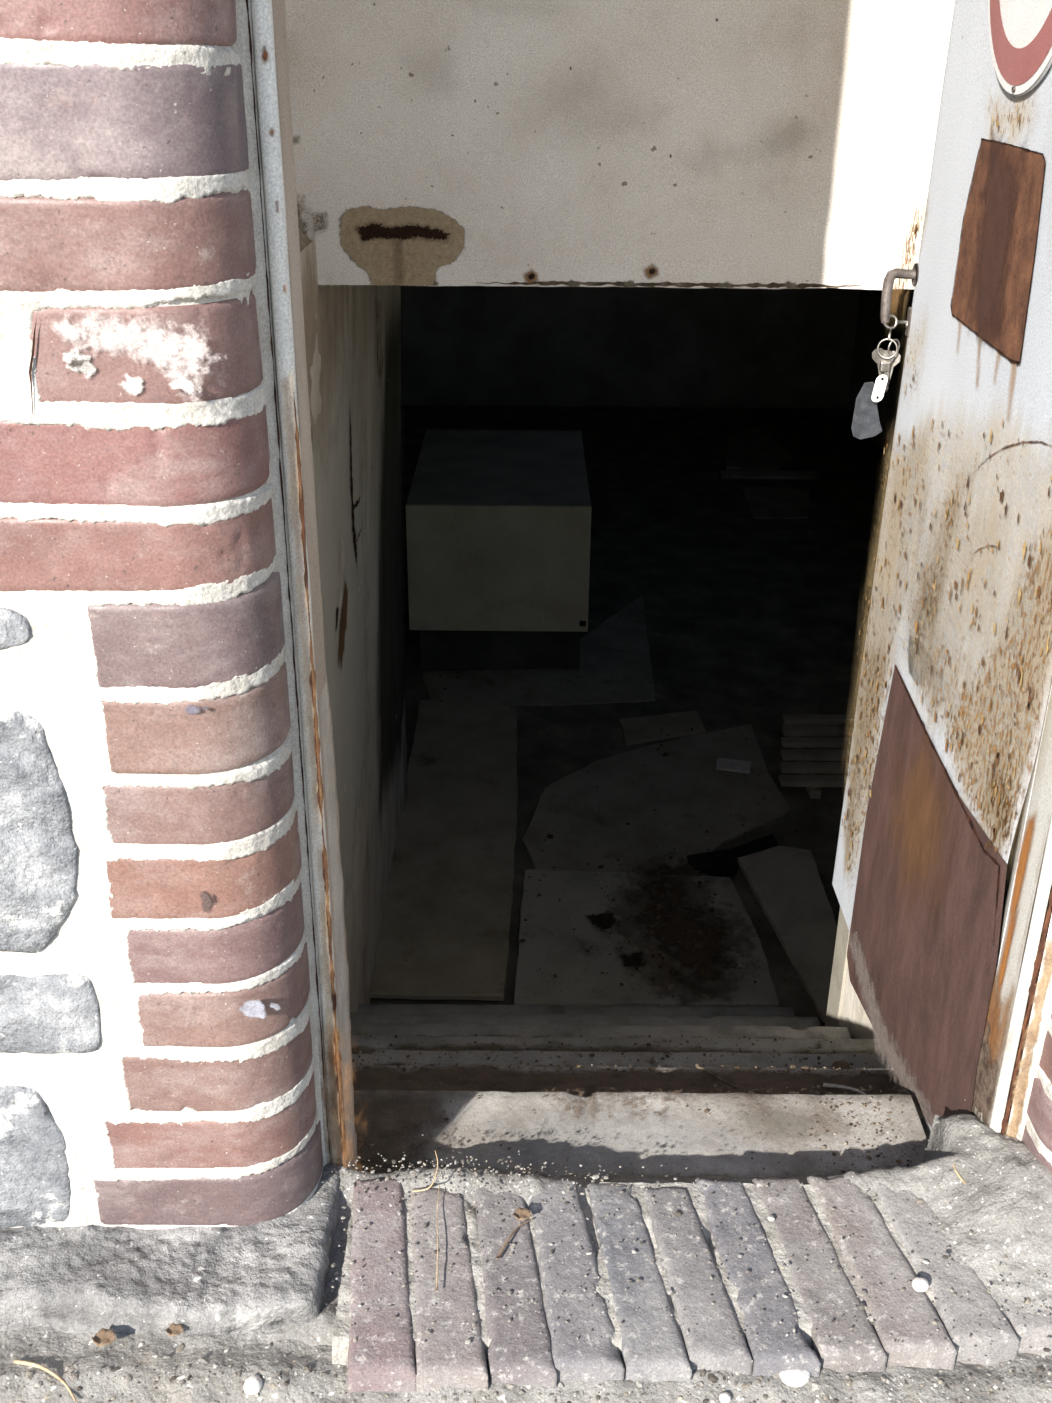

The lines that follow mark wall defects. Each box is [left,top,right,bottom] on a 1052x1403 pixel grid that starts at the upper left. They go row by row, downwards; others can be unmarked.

leakage [297,204,326,234]
spalling [340,198,465,286]
spalling [477,280,861,289]
rust [891,201,924,310]
rust [950,104,1046,389]
crack [350,413,361,562]
rust [294,397,348,1167]
rust [842,418,1052,1138]